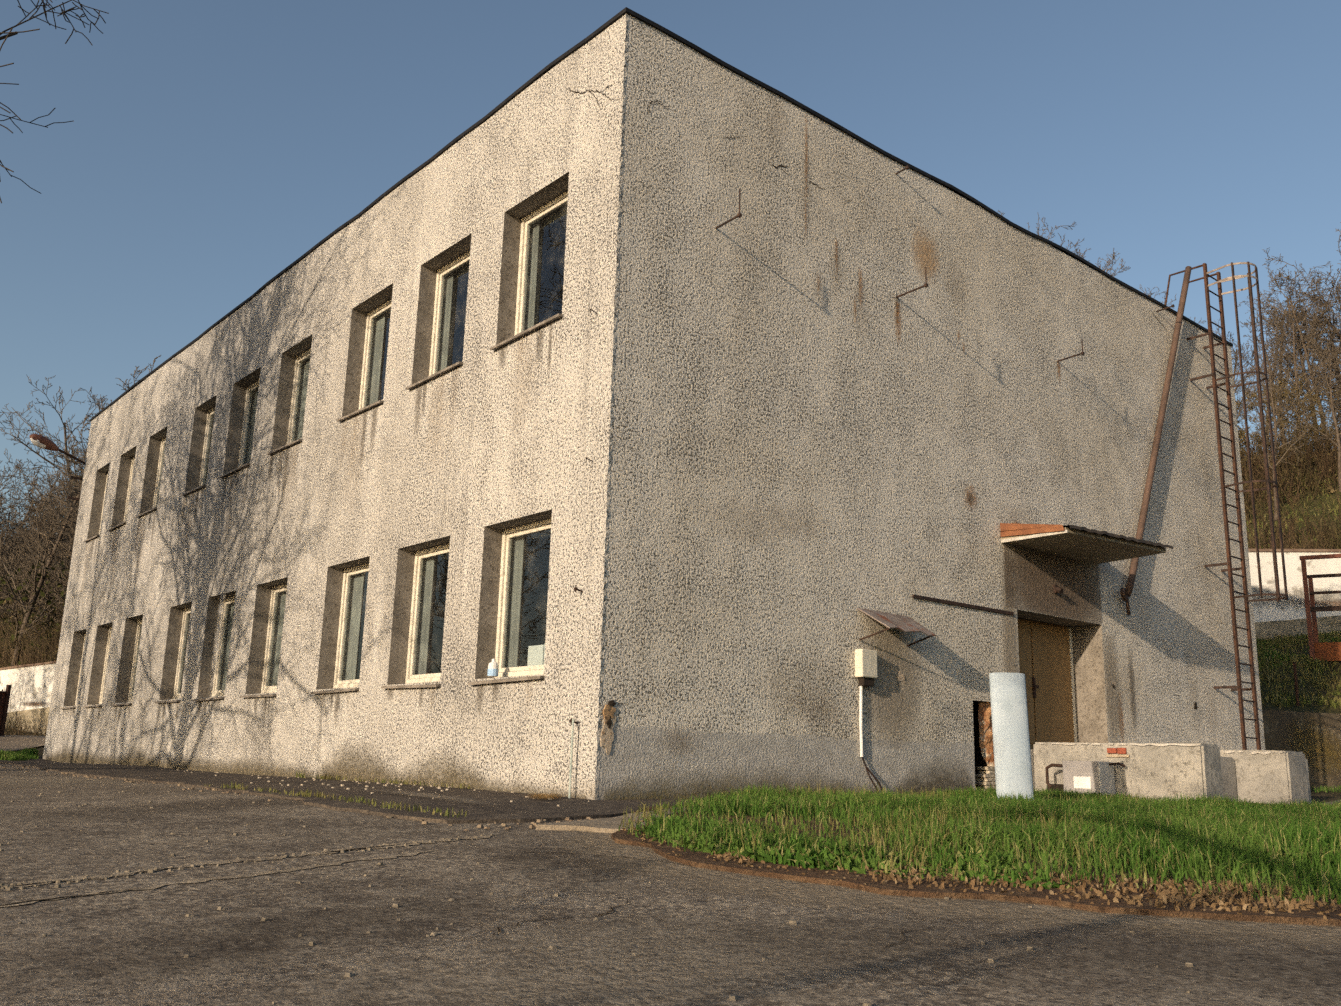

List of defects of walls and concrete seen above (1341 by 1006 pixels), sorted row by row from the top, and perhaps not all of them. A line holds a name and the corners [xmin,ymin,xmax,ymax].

crack [565,85,617,108]